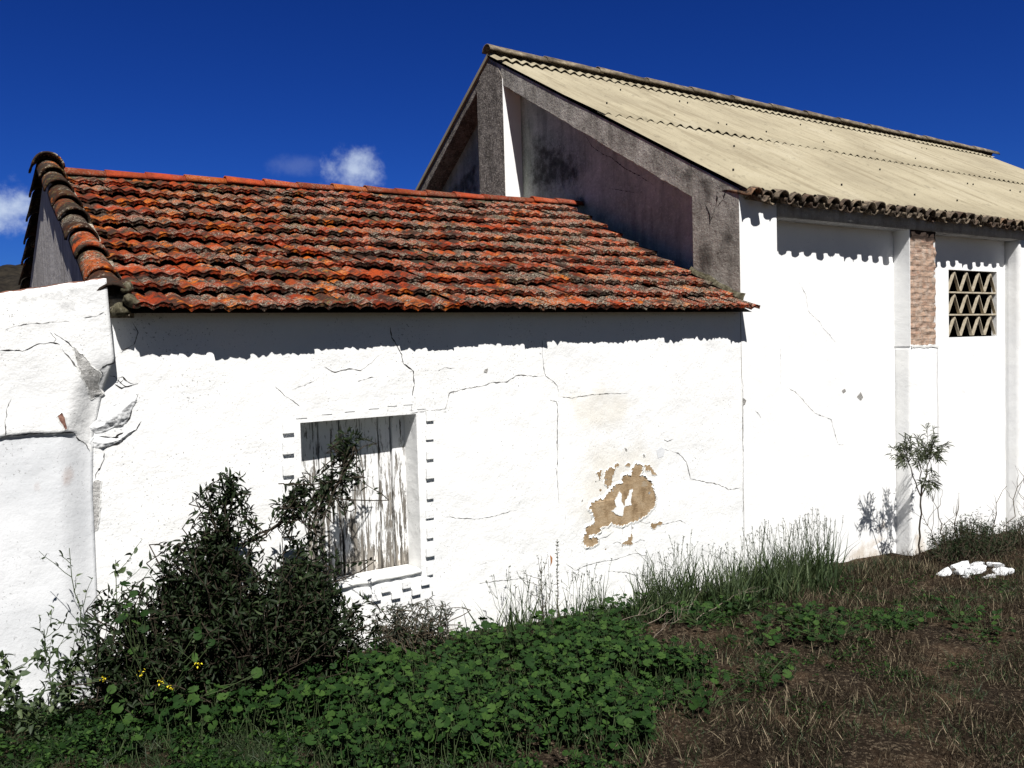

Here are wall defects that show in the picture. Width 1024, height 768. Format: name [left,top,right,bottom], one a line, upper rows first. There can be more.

crack [2,312,141,479]
crack [390,328,622,499]
peeling [580,447,665,550]
crack [665,439,744,547]